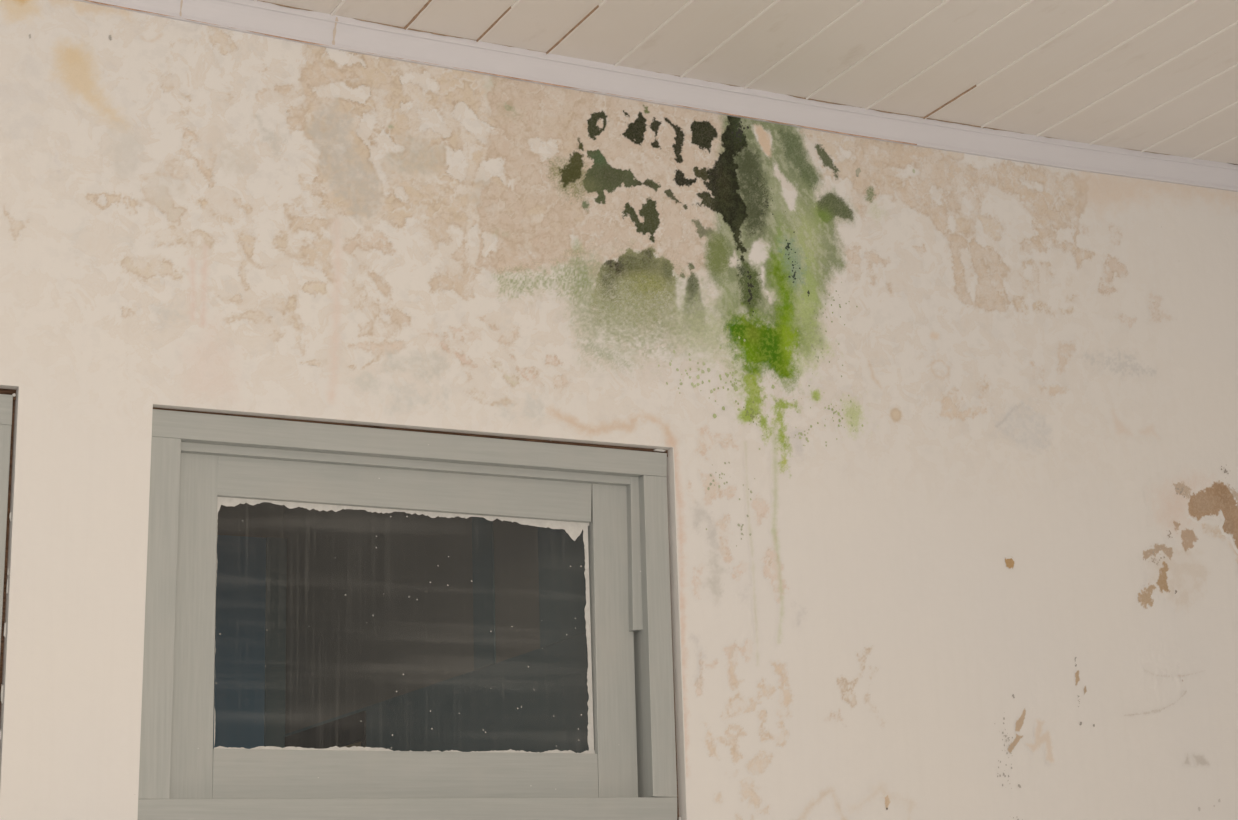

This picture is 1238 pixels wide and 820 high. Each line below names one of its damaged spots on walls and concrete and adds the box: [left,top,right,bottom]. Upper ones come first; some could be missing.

peeling [61,20,719,427]
damp [484,102,765,386]
mould [813,142,892,229]
peeling [806,129,1130,318]
flaking render [1137,461,1238,617]